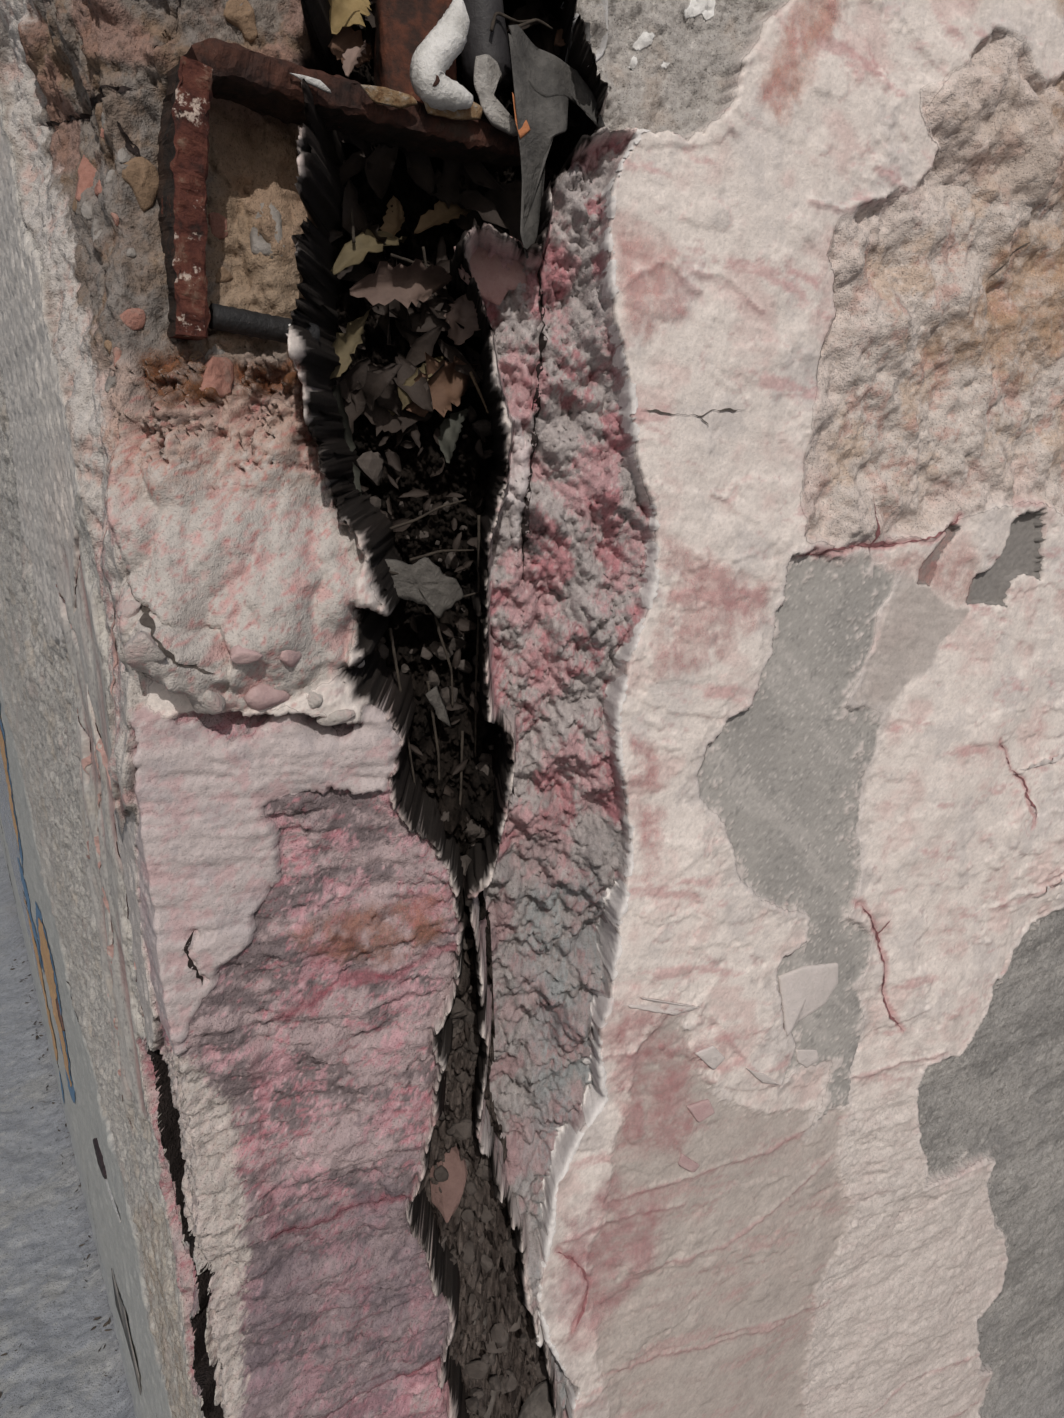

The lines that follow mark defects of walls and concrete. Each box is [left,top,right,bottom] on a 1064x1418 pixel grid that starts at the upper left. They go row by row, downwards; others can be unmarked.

crack [44,85,158,157]
crack [345,20,375,86]
crack [456,0,554,120]
flaking render [920,27,1064,135]
peeling [0,0,788,1418]
crack [331,126,572,856]
flaking render [697,154,1064,1126]
crack [184,931,203,984]
crack [146,1041,224,1418]
crack [418,891,547,1418]
crack [557,1252,589,1327]
peeling [917,908,1064,1418]